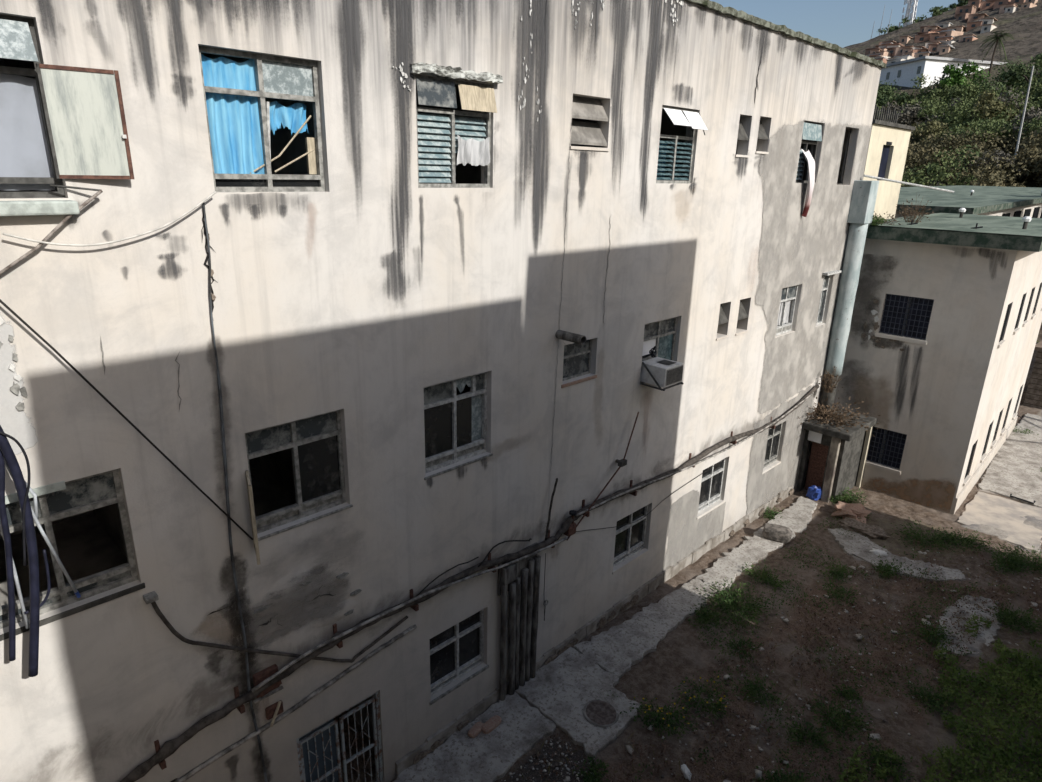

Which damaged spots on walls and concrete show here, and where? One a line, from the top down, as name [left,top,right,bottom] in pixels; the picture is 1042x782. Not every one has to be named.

leakage [118,0,154,96]
leakage [168,0,280,104]
leakage [339,0,364,179]
peeling [392,62,411,91]
leakage [382,0,423,297]
peeling [518,33,542,121]
leakage [517,0,550,253]
leakage [574,0,682,216]
leakage [160,253,179,277]
peeling [0,316,38,455]
crack [99,336,107,374]
crack [174,352,182,410]